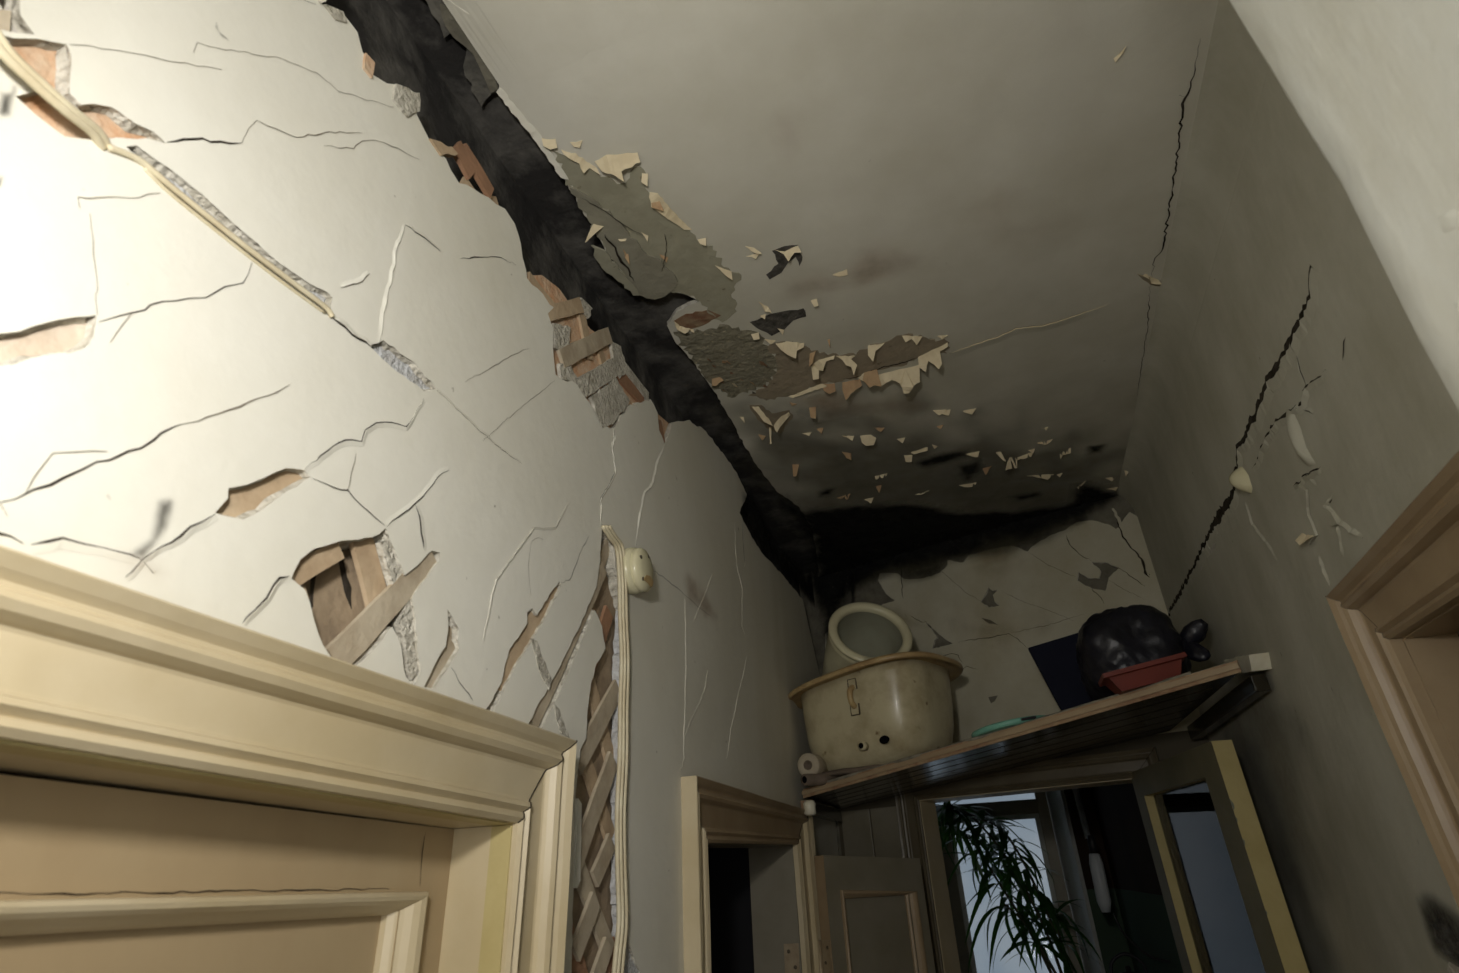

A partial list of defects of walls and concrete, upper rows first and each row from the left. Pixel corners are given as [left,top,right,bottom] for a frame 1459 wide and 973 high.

spalling [0,0,331,315]
crack [70,42,418,159]
crack [443,0,665,87]
peeling [425,0,950,444]
crack [0,384,290,582]
spalling [215,469,307,519]
spalling [291,531,457,688]
crack [305,348,554,551]
damp [745,486,1117,639]
damp [921,453,978,479]
crack [941,265,1346,669]
spalling [487,530,639,973]